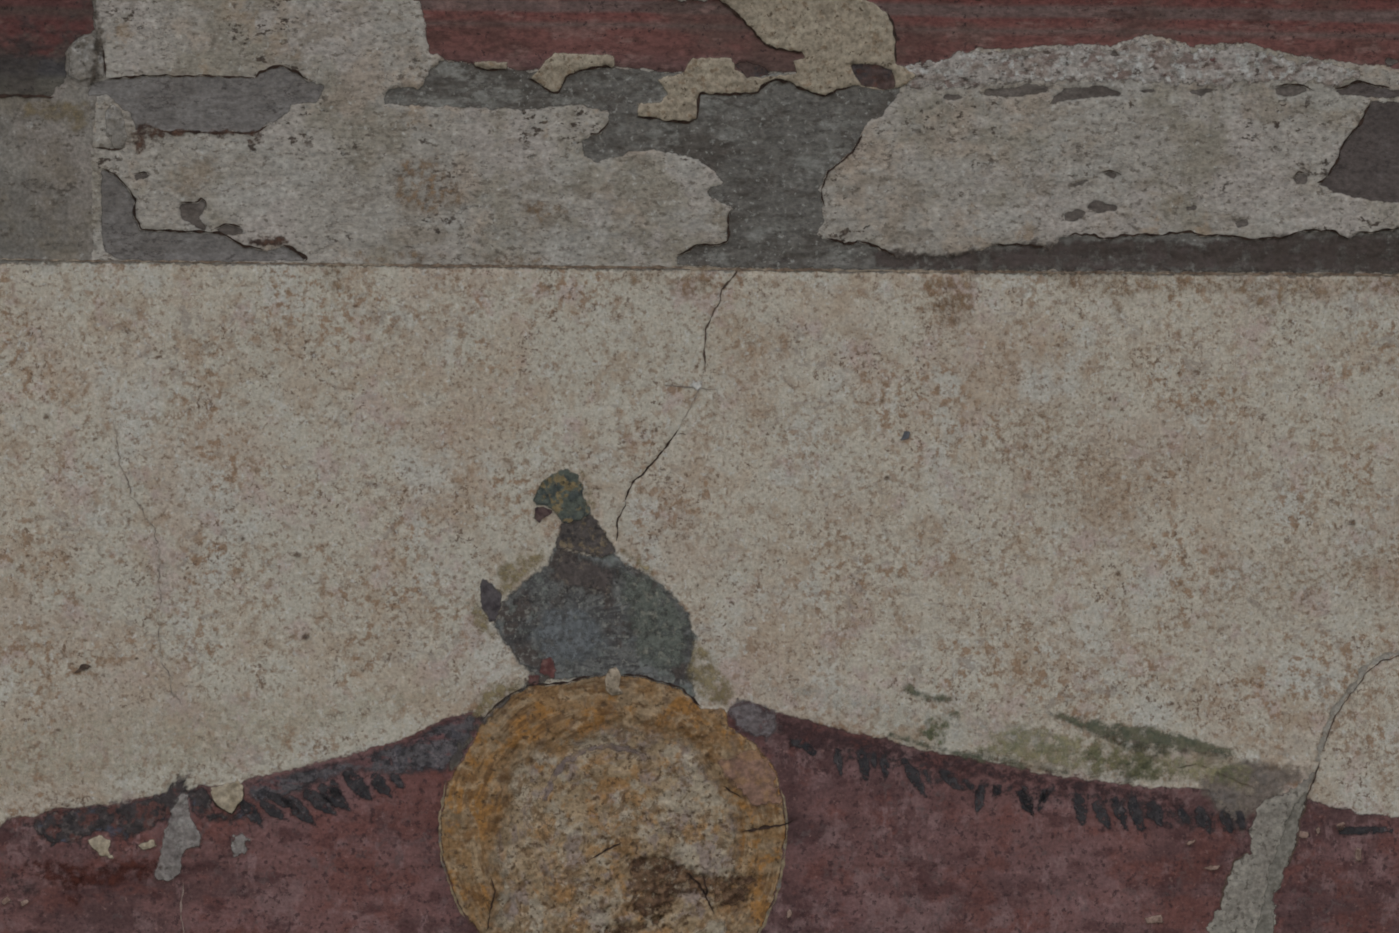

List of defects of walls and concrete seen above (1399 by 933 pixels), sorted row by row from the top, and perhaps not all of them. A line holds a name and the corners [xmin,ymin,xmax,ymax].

peeling [88,65,324,135]
peeling [384,37,1399,274]
peeling [101,168,308,262]
crack [0,258,1399,541]
peeling [23,774,250,859]
peeling [1178,760,1299,821]
crack [1206,651,1399,933]